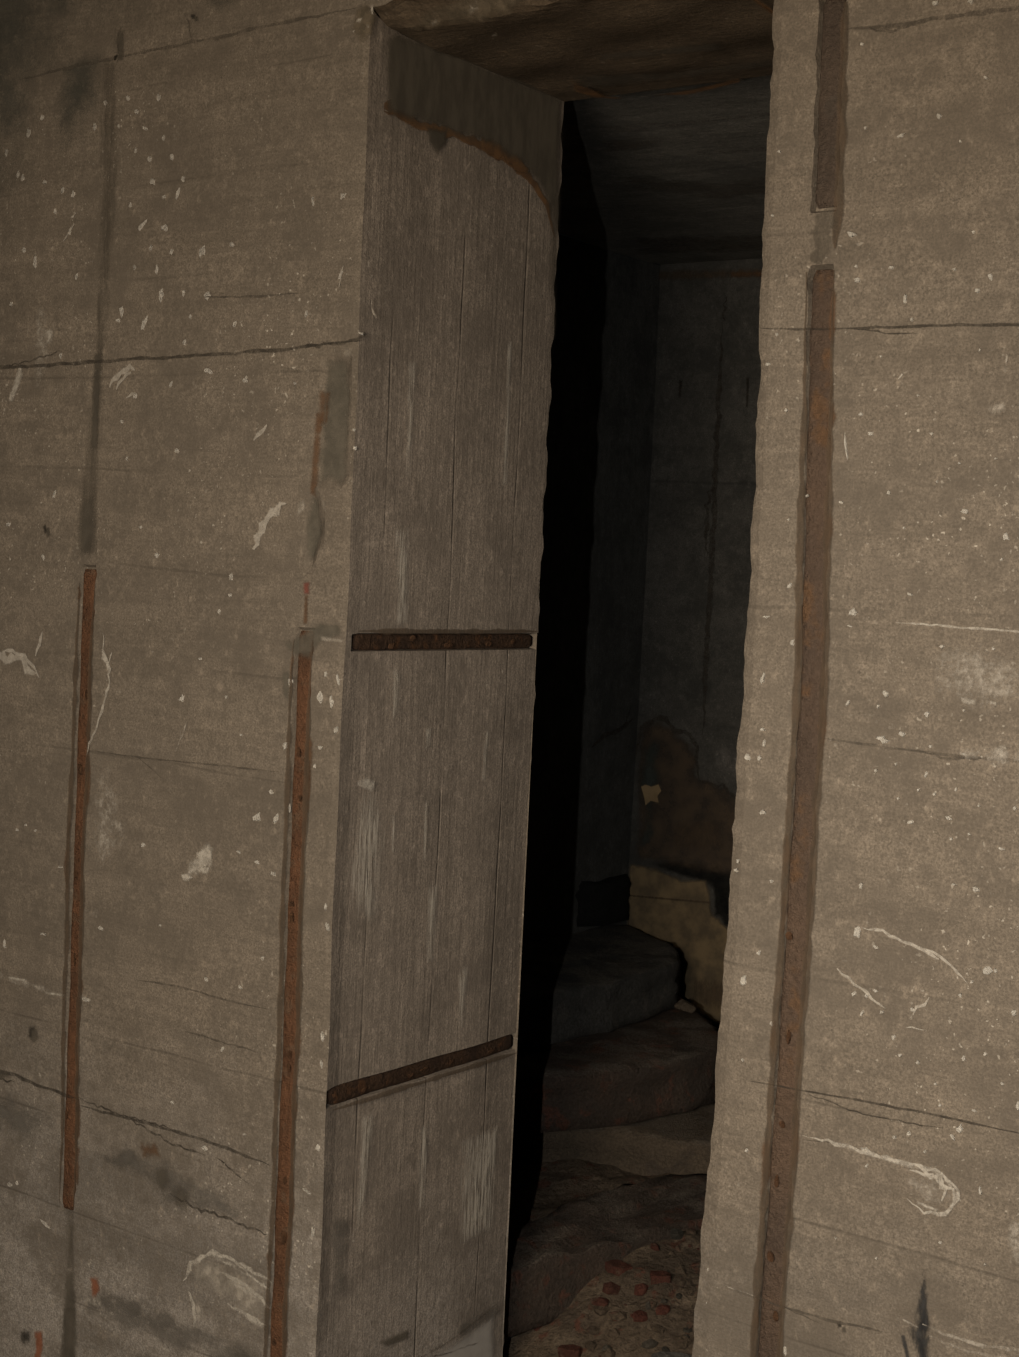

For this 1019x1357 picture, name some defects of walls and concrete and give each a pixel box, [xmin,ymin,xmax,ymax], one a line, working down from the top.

crack [0,335,364,369]
rust [351,629,537,650]
rust [750,0,848,1357]
rust [59,569,97,1210]
rust [263,584,314,1357]
crack [1,1070,270,1183]
rust [326,1034,516,1110]
crack [170,1193,267,1235]